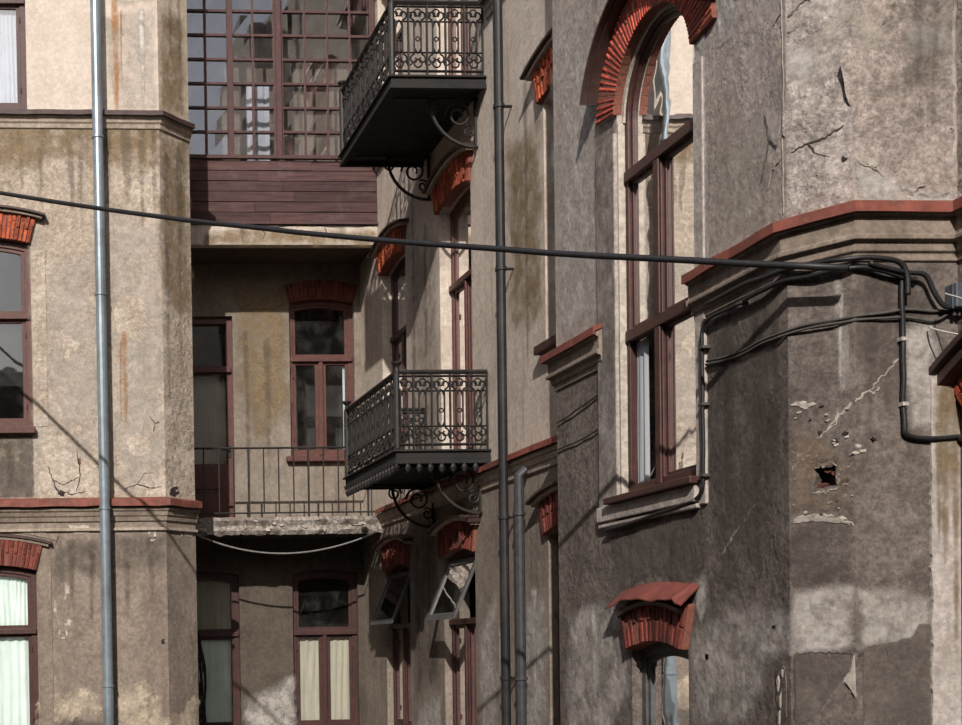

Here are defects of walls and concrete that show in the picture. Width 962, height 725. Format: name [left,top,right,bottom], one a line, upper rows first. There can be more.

damp [0,129,91,164]
crack [760,0,844,214]
damp [103,129,189,310]
crack [48,452,86,495]
crack [125,472,162,489]
flaking render [790,401,866,526]
crack [791,358,899,471]
flaking render [691,586,928,725]